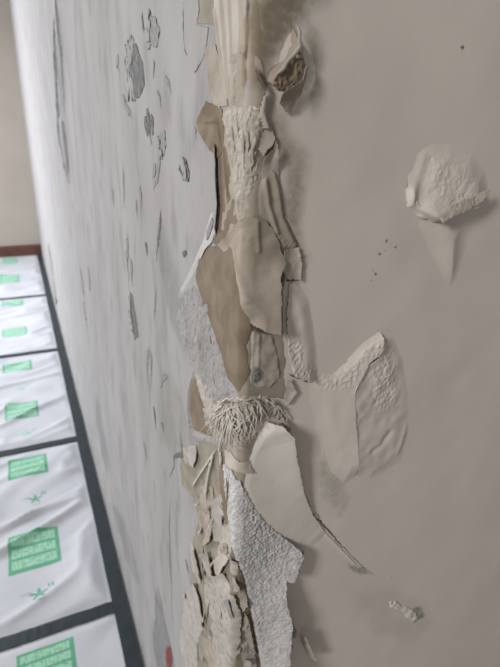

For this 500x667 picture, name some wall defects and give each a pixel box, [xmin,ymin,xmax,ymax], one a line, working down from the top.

peeling [124,36,144,102]
peeling [157,130,166,159]
peeling [176,0,318,405]
peeling [179,417,325,667]
crack [312,512,373,574]